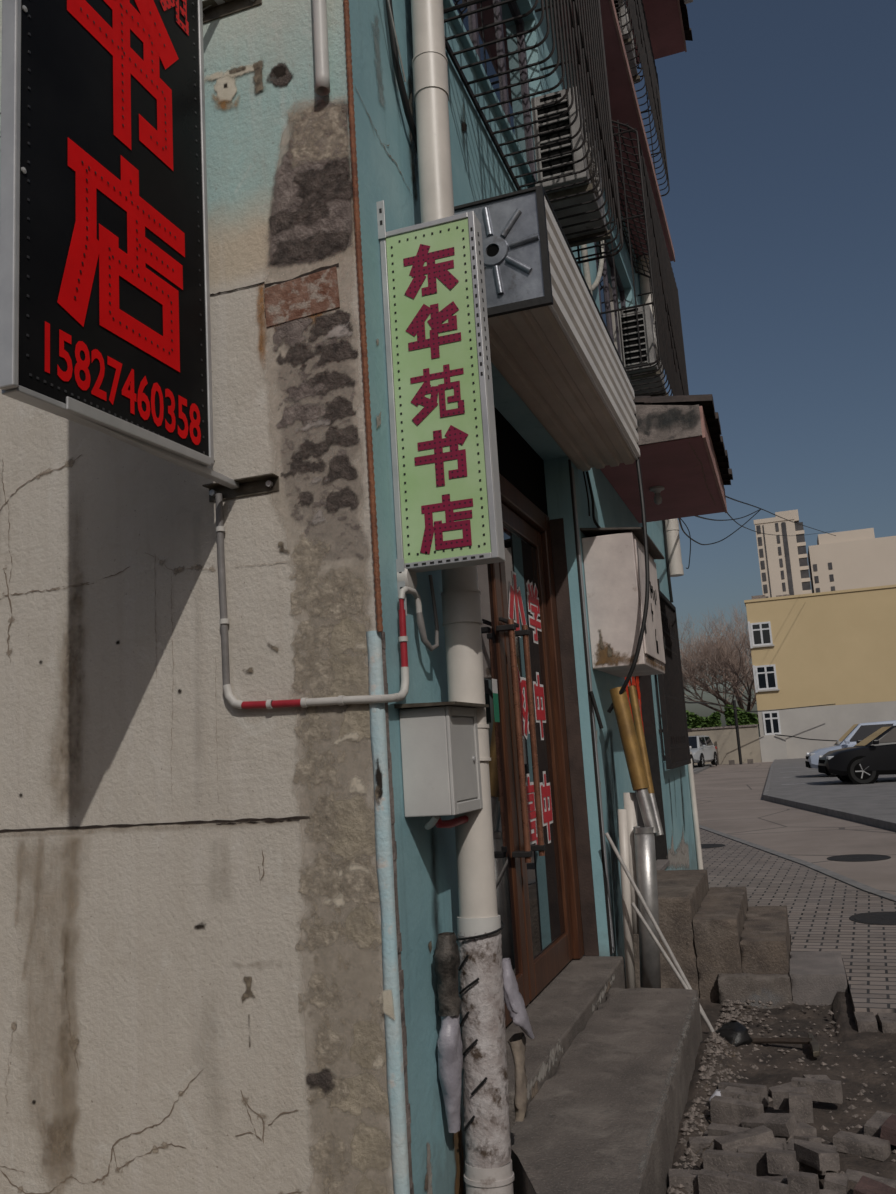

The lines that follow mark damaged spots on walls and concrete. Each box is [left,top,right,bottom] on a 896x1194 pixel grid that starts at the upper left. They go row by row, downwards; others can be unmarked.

spalling [204,60,293,109]
crack [0,455,328,833]
spalling [265,99,395,1194]
crack [5,1016,17,1112]
crack [1,1072,200,1194]
crack [236,1090,304,1143]